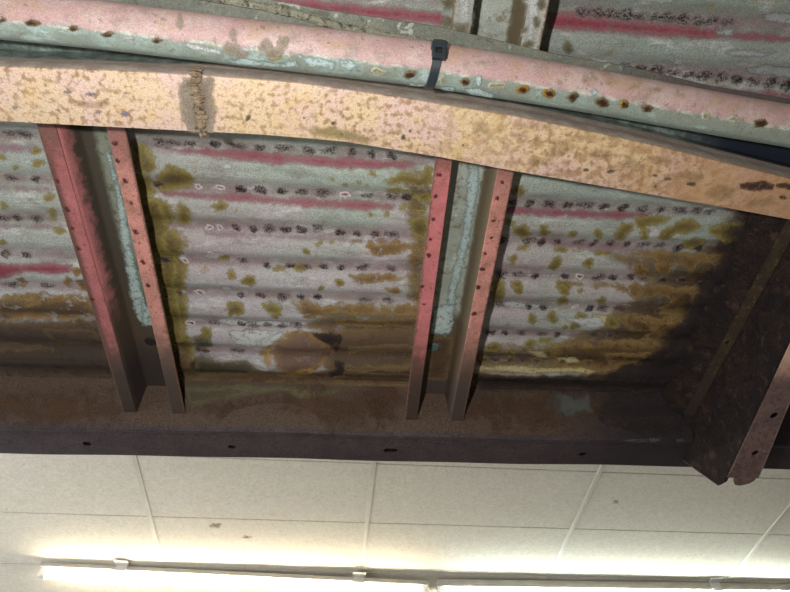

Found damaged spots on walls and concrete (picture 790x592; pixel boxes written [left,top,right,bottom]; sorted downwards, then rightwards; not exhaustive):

rust [594,97,609,107]
rust [727,115,768,128]
rust [740,181,790,200]